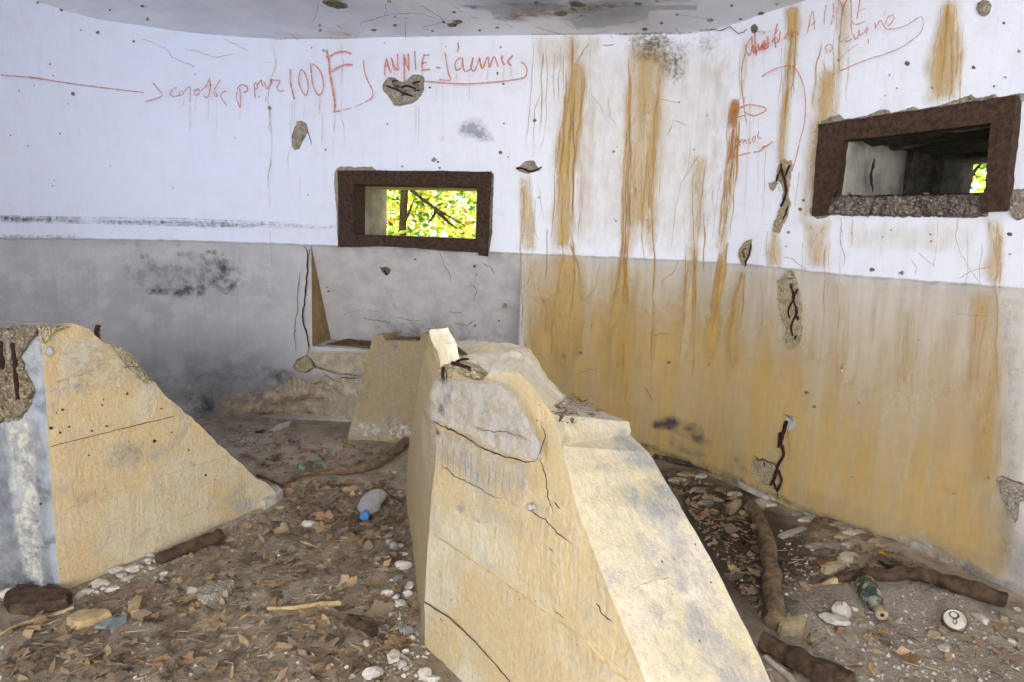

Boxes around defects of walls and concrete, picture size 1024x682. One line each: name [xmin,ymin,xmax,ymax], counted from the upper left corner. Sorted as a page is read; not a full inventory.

spalling [292,121,312,150]
spalling [382,74,431,106]
leakage [624,29,715,74]
rust [720,55,746,223]
rust [809,17,842,184]
rust [932,4,961,103]
rust [528,50,585,365]
rust [606,52,664,338]
spalling [737,239,753,266]
spalling [769,158,991,247]
crack [294,248,359,397]
spalling [777,269,803,348]